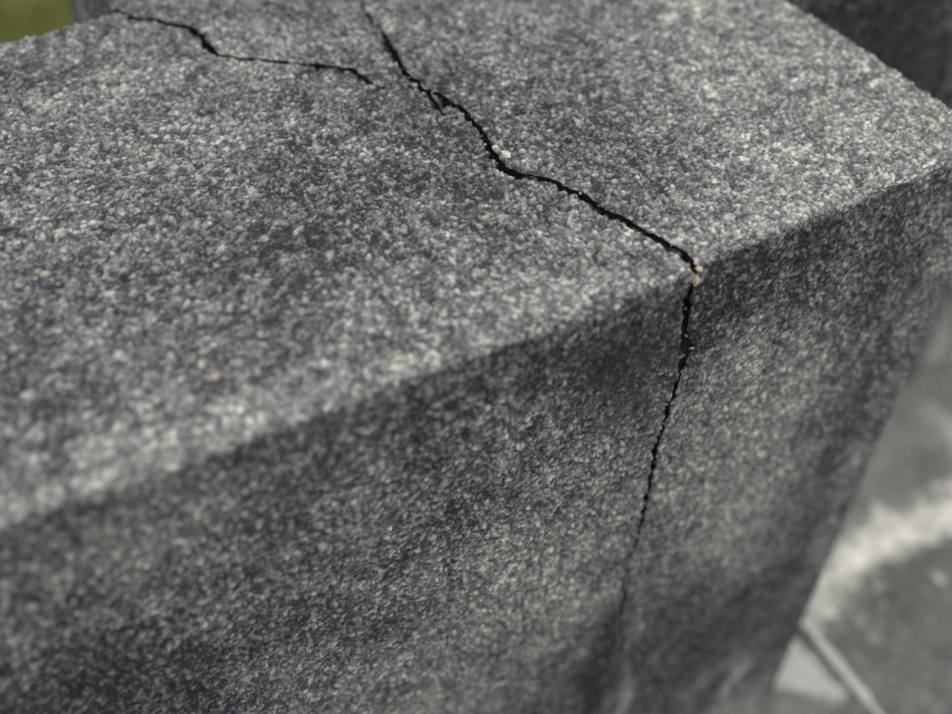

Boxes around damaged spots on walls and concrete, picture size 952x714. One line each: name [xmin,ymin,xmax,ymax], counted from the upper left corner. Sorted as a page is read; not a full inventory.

crack [114,1,703,700]
damp [798,481,952,676]